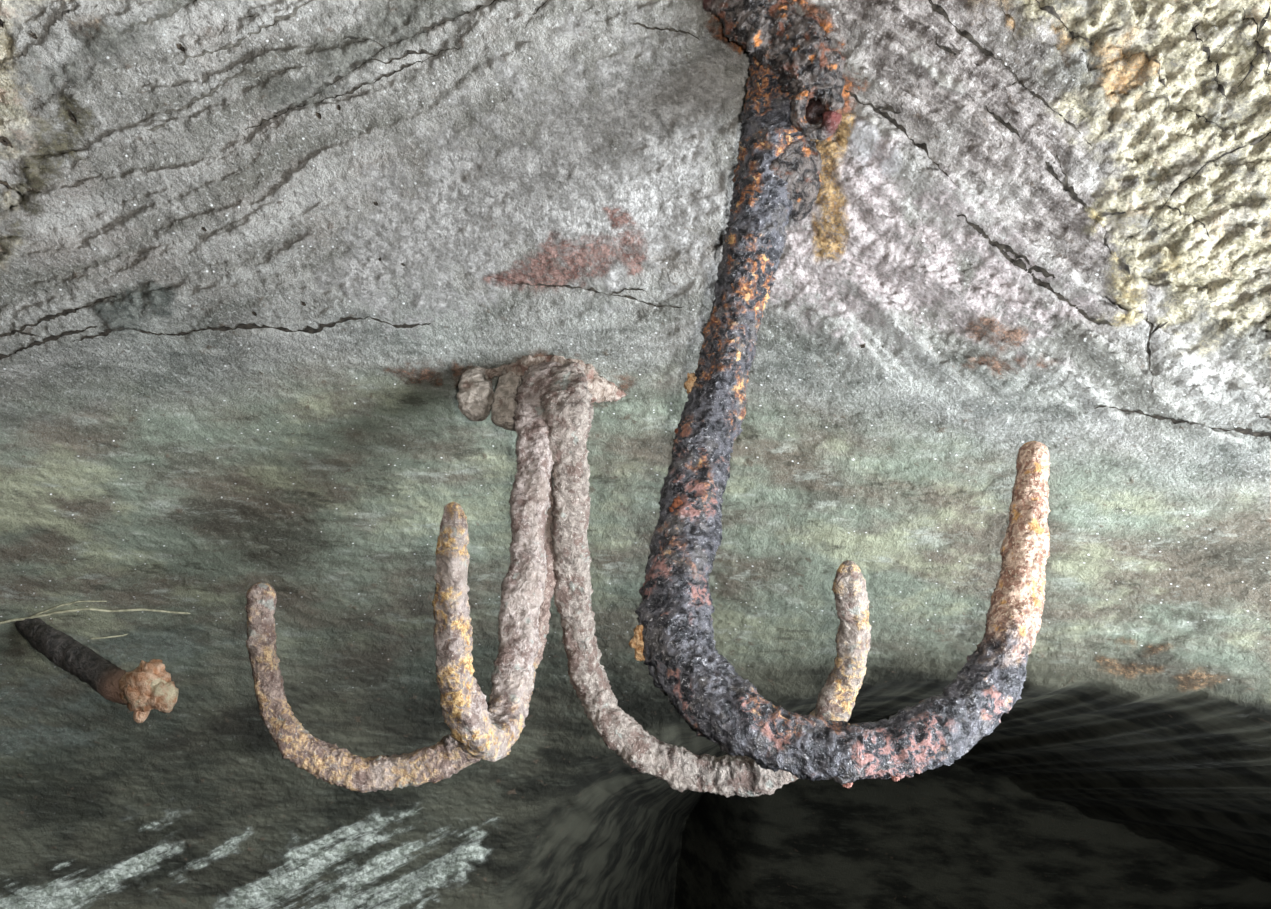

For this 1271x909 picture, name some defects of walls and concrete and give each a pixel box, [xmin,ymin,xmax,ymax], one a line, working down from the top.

crack [120,0,197,34]
crack [140,0,498,132]
crack [633,22,699,39]
rust [708,14,744,52]
rust [786,0,844,57]
rust [484,207,647,290]
rust [810,76,866,260]
crack [845,90,1112,326]
crack [928,0,1271,439]
crack [0,296,431,360]